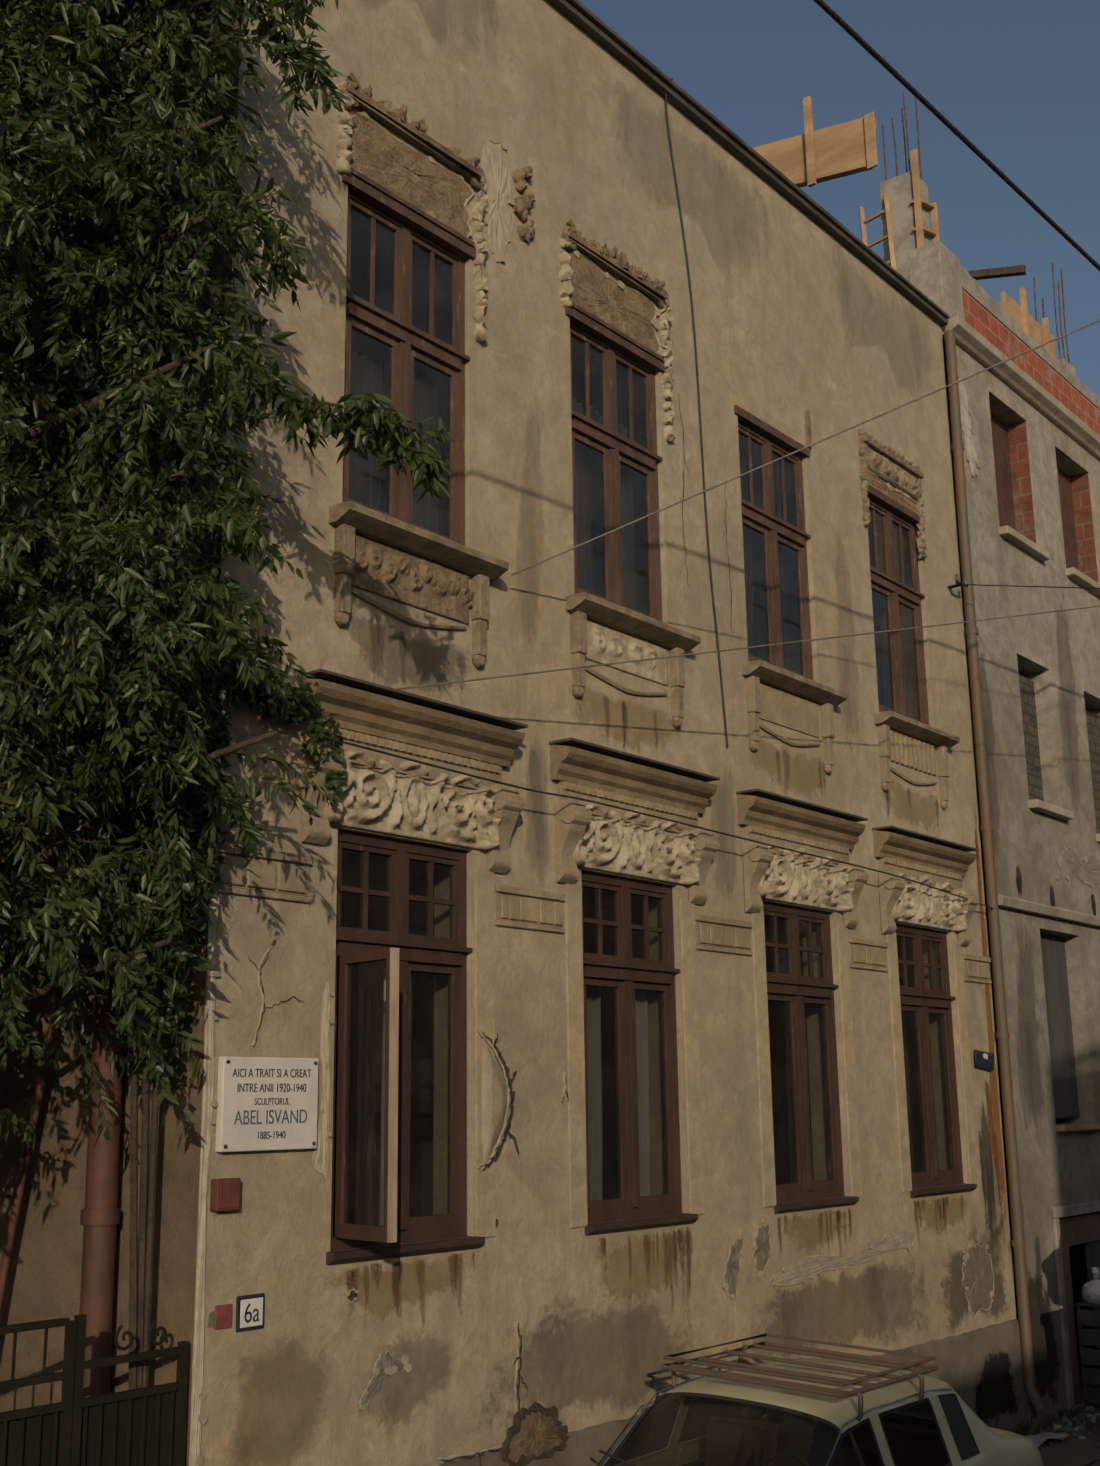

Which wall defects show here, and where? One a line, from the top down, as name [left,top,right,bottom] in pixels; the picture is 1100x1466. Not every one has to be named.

crack [249,939,302,1047]
crack [477,1029,520,1170]
water stain [945,1105,1006,1328]
flaking render [359,1349,412,1410]
spalling [501,1402,569,1466]